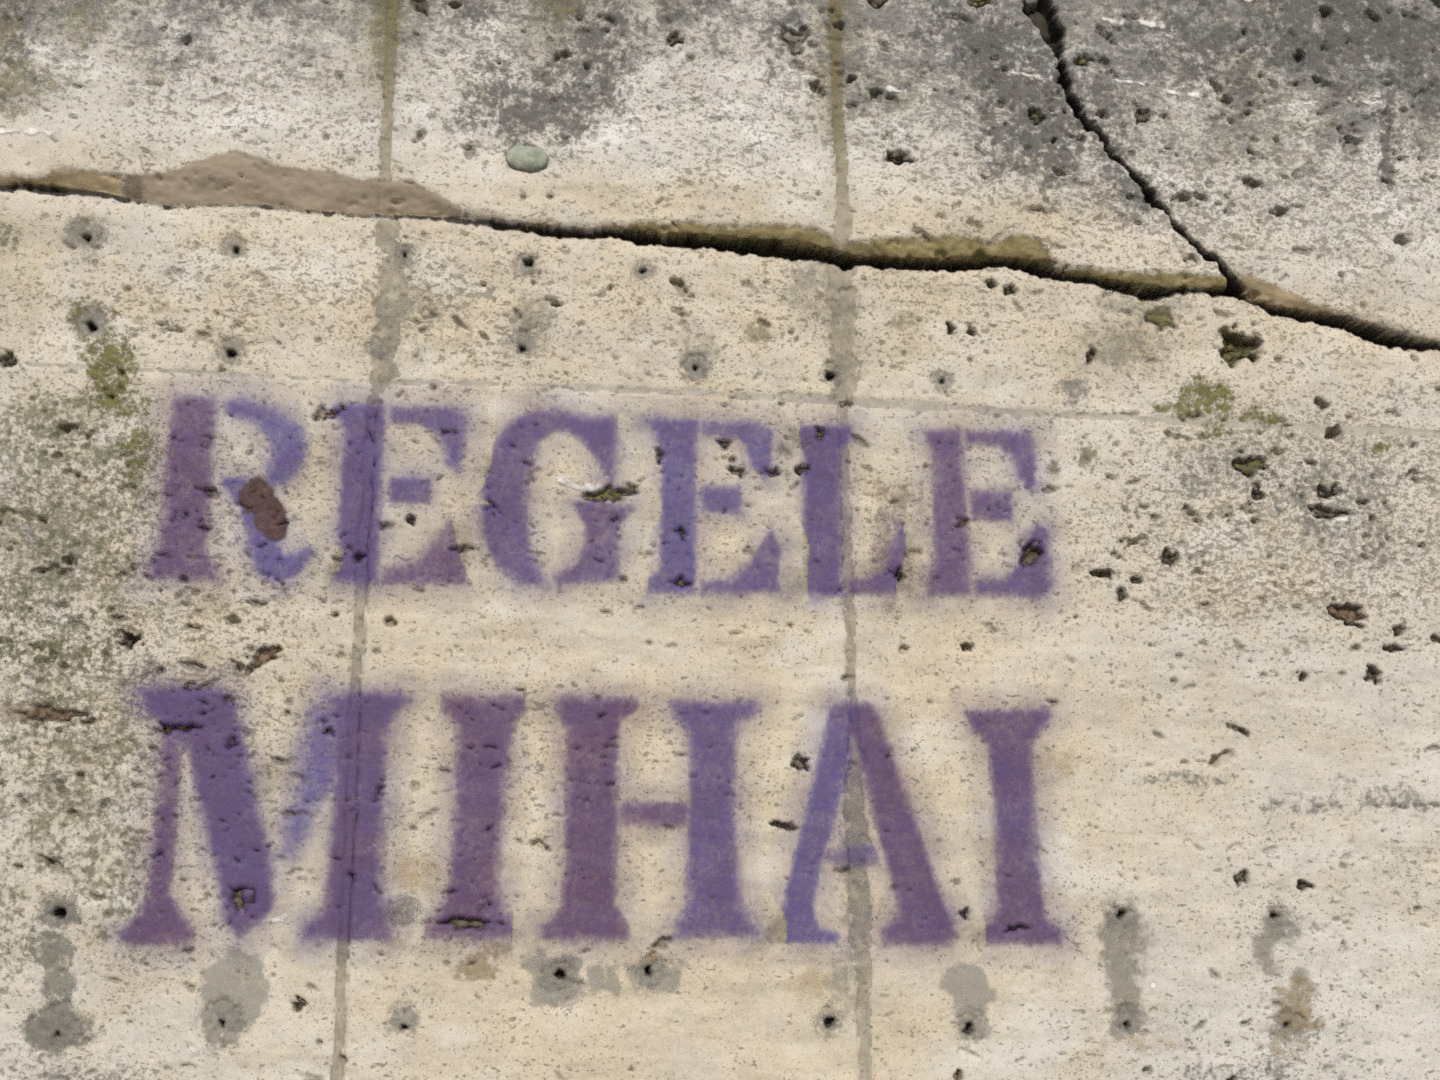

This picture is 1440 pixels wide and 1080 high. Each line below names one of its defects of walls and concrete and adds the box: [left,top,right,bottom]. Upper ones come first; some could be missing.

crack [375,0,1440,352]
crack [0,184,171,209]
crack [306,208,335,216]